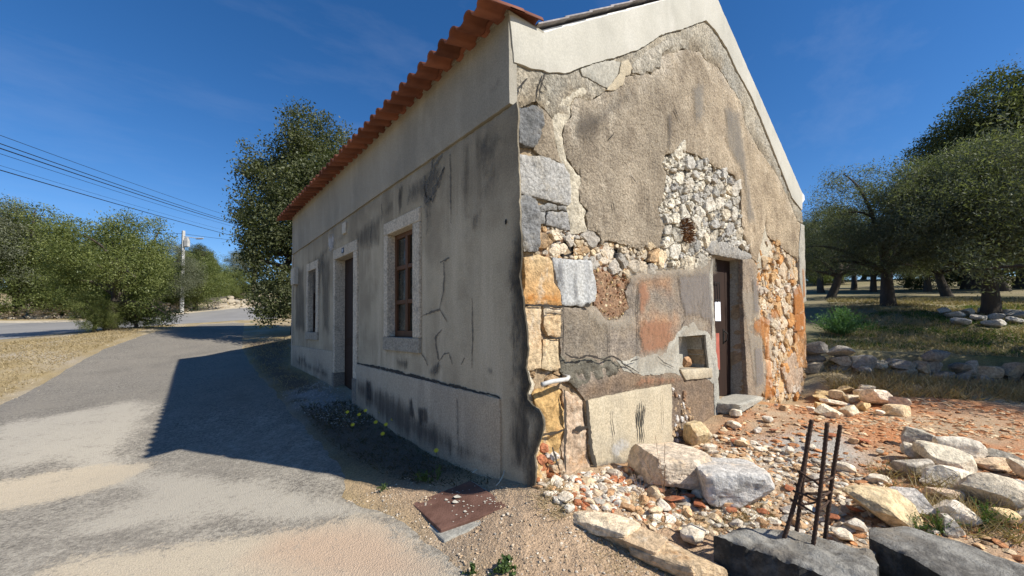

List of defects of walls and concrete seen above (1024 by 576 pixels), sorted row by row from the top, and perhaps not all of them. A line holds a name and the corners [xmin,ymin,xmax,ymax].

flaking render [534,140,806,404]
crack [357,258,500,399]
crack [525,304,685,373]
leakage [358,383,451,451]
flaking render [528,369,565,397]
flaking render [536,443,566,482]